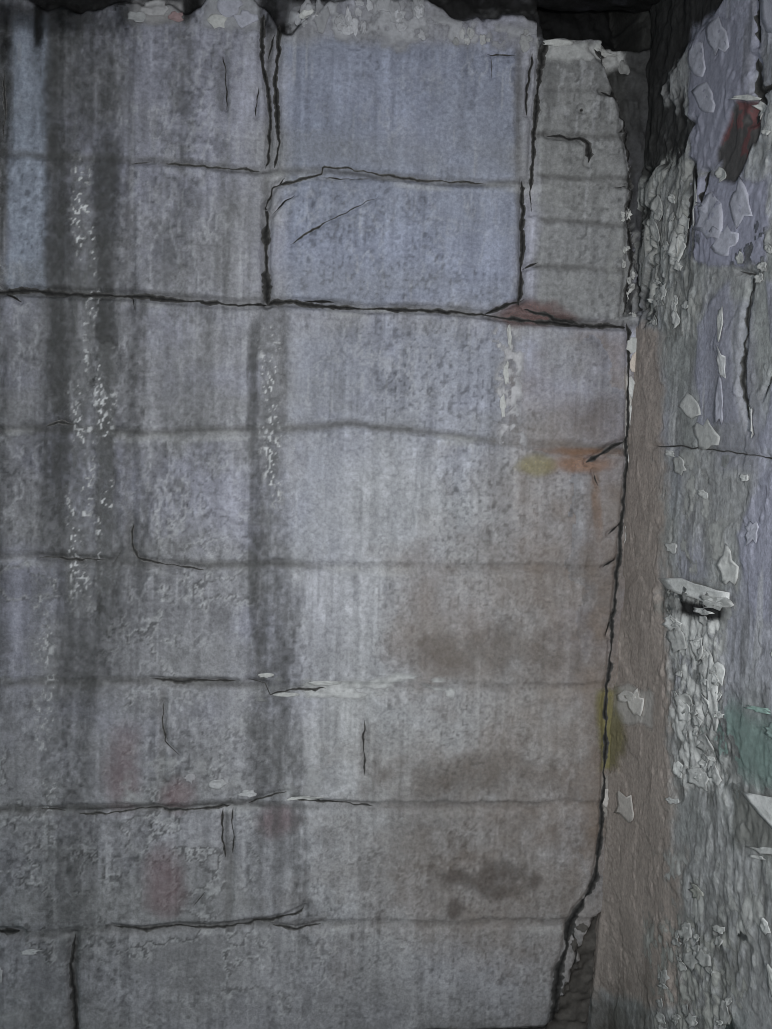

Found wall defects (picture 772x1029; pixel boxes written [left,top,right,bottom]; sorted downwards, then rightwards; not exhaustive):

crack [168,15,282,172]
peeling [759,0,772,33]
peeling [607,15,772,337]
water stain [47,58,116,605]
water stain [249,347,281,496]
peeling [623,337,637,462]
crack [0,39,634,1029]
peeling [659,306,772,860]
water stain [598,691,624,768]
peeling [602,777,634,823]
peeling [613,683,654,728]
peeling [644,851,771,1029]